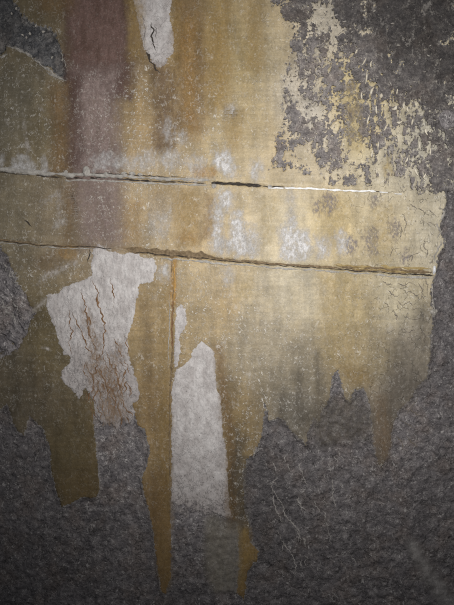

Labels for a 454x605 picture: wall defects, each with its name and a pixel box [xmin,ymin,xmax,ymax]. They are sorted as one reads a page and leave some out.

spalling [0,0,68,81]
flaking render [133,0,174,73]
leakage [213,151,236,177]
leakage [212,191,256,258]
leakage [277,216,329,261]
rust [68,281,133,427]
crack [0,166,436,519]
spalling [241,0,454,605]
spalling [0,244,244,605]